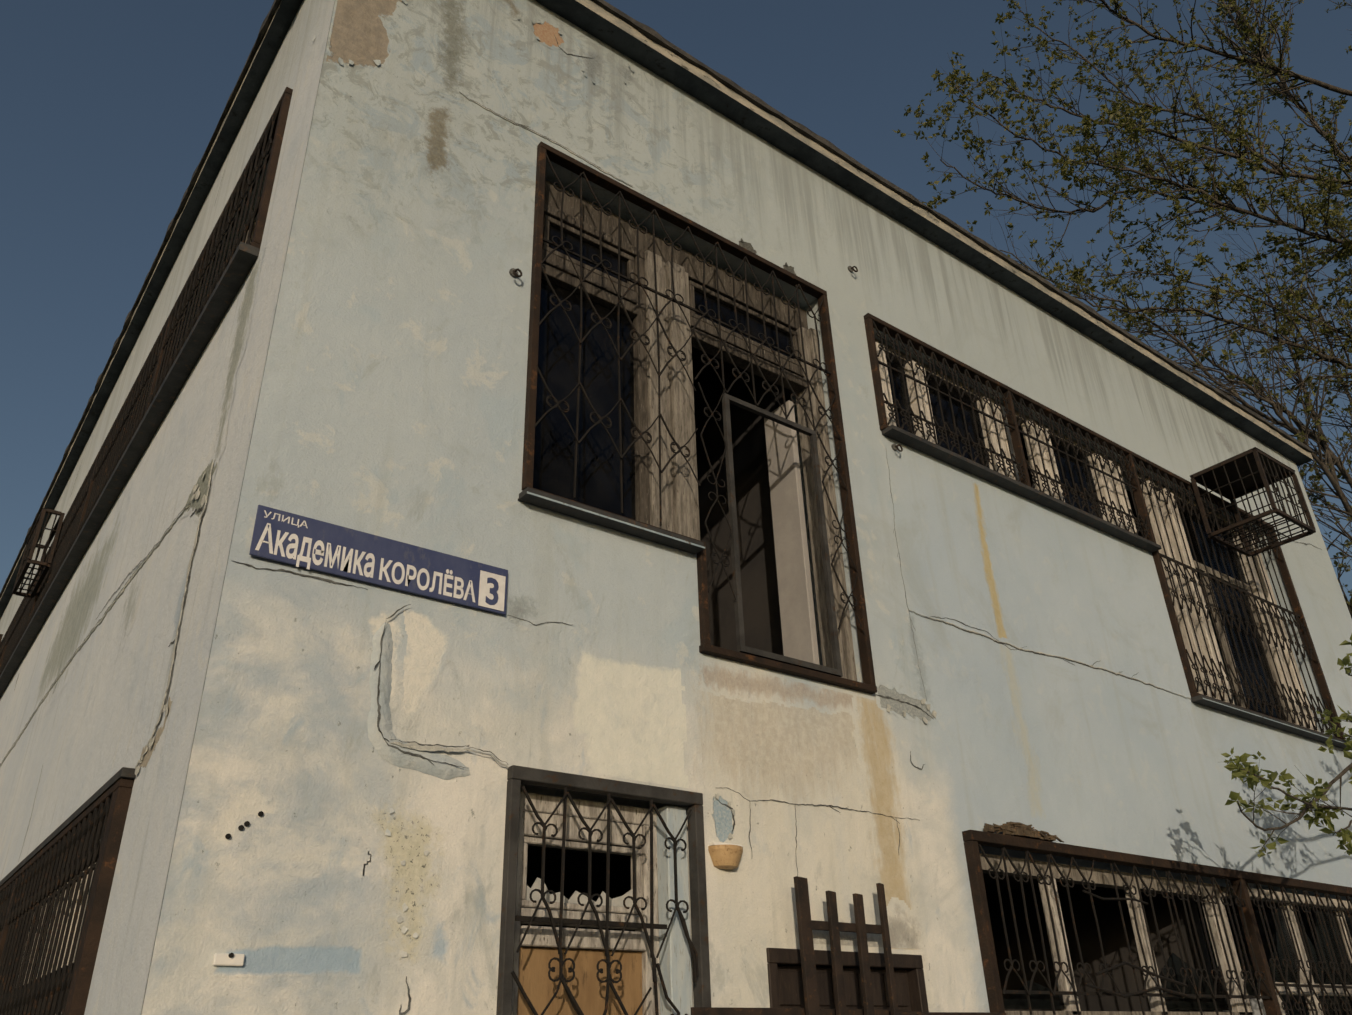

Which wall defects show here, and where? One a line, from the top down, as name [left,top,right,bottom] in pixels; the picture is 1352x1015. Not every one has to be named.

peeling [323,0,419,79]
crack [0,460,215,769]
crack [231,560,368,590]
crack [374,604,508,768]
damp [681,640,860,831]
crack [874,451,1189,717]
crack [718,787,918,876]